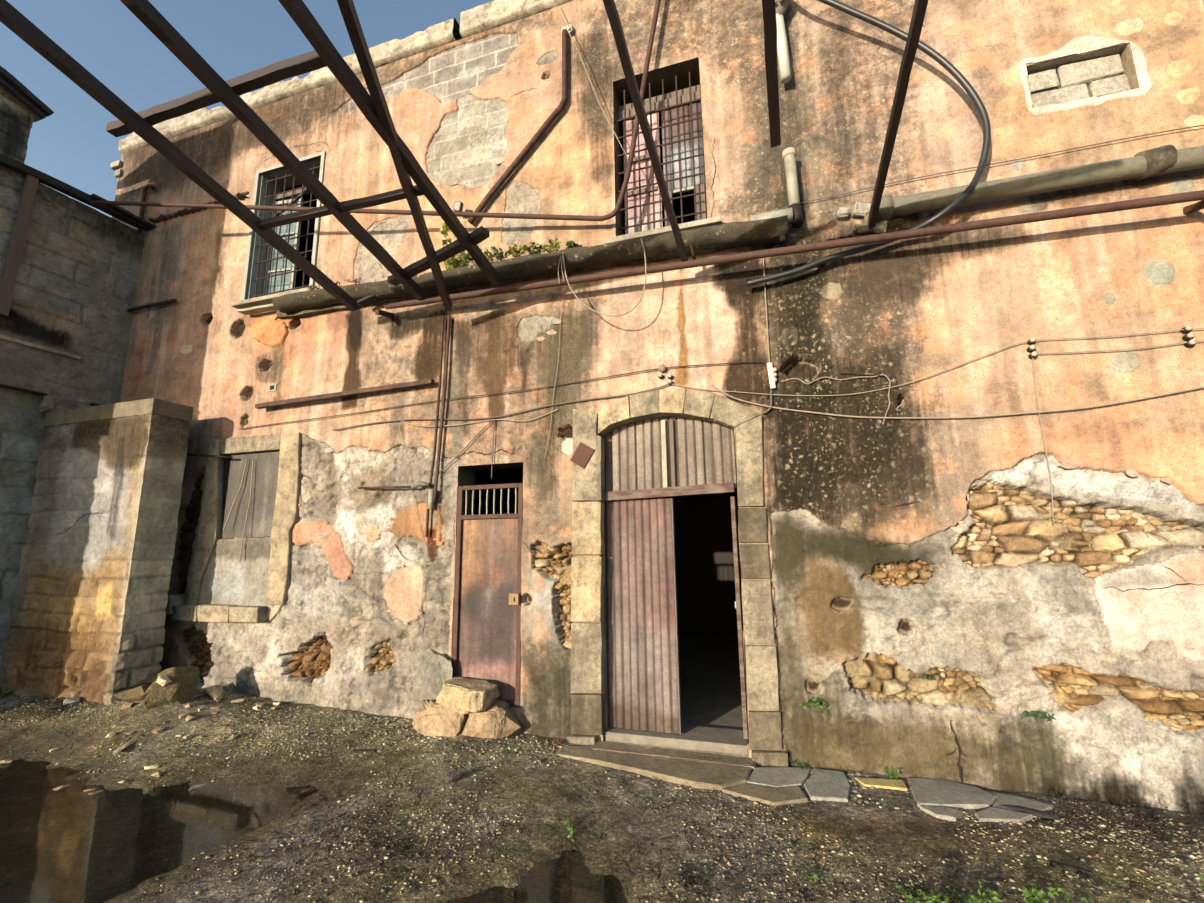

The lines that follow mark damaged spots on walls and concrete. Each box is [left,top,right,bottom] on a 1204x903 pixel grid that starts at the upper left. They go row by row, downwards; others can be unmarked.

spalling [366,33,518,188]
water stain [0,309,69,345]
water stain [341,308,362,409]
spalling [354,215,413,283]
water stain [389,310,597,498]
spalling [502,181,541,246]
water stain [714,234,937,653]
water stain [840,217,1024,304]
spalling [183,434,461,719]
spalling [534,542,574,649]
spalling [769,453,1204,812]
water stain [778,630,1147,808]